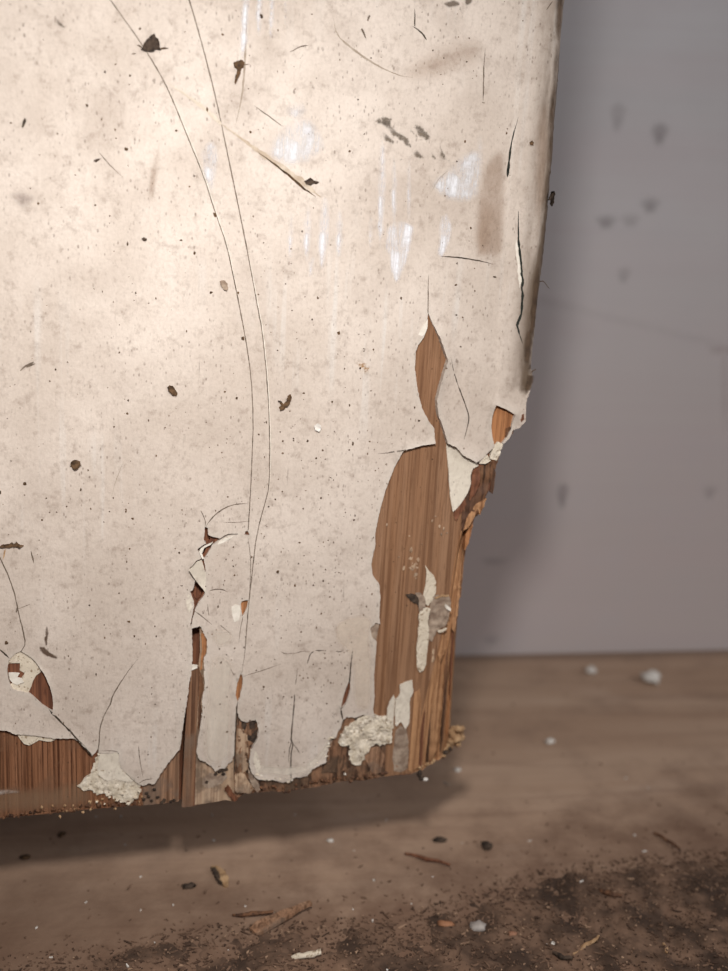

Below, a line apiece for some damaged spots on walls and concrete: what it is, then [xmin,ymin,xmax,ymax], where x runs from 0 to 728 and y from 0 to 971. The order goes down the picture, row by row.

crack [515,211,524,341]
crack [110,0,353,782]
peeling [186,530,233,613]
peeling [231,600,248,622]
peeling [234,315,526,798]
peeling [8,651,53,710]
peeling [0,730,143,819]
crack [50,659,150,783]